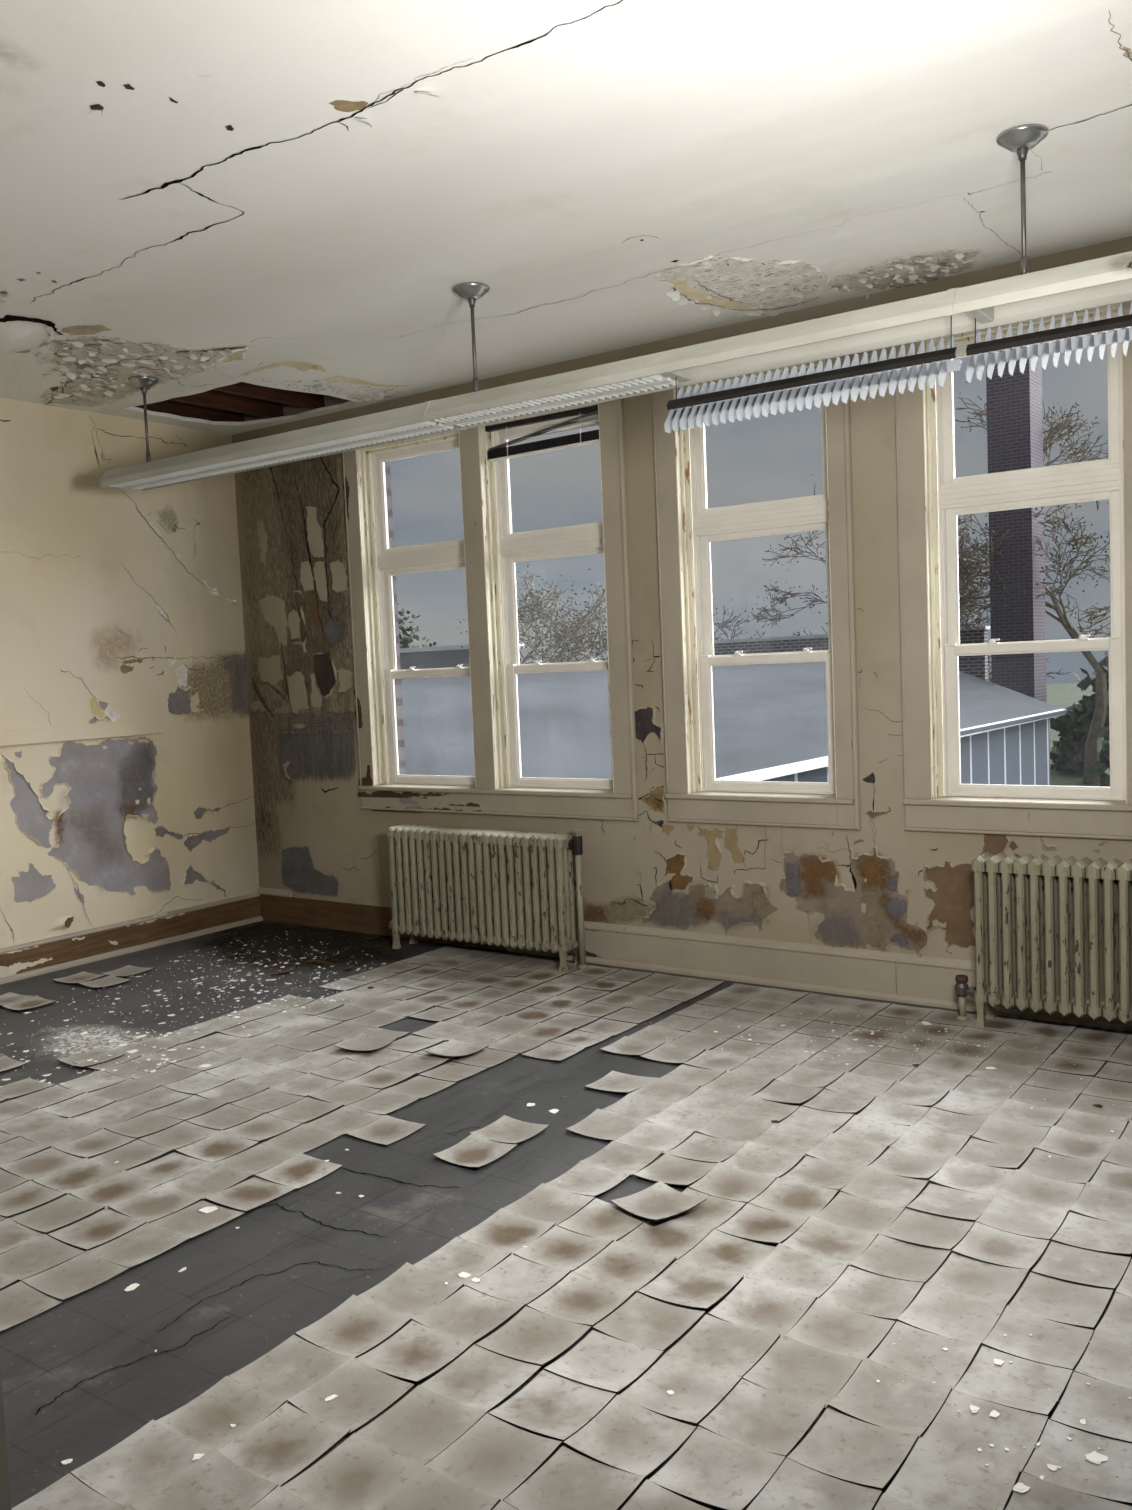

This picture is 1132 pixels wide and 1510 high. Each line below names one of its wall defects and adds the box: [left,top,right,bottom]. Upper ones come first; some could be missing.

crack [1108,11,1132,61]
crack [32,0,623,302]
peeling [653,252,976,317]
peeling [14,325,409,406]
peeling [166,657,249,718]
peeling [354,688,363,729]
peeling [634,706,665,749]
peeling [0,670,338,927]
peeling [638,771,1018,958]
peeling [0,945,52,978]